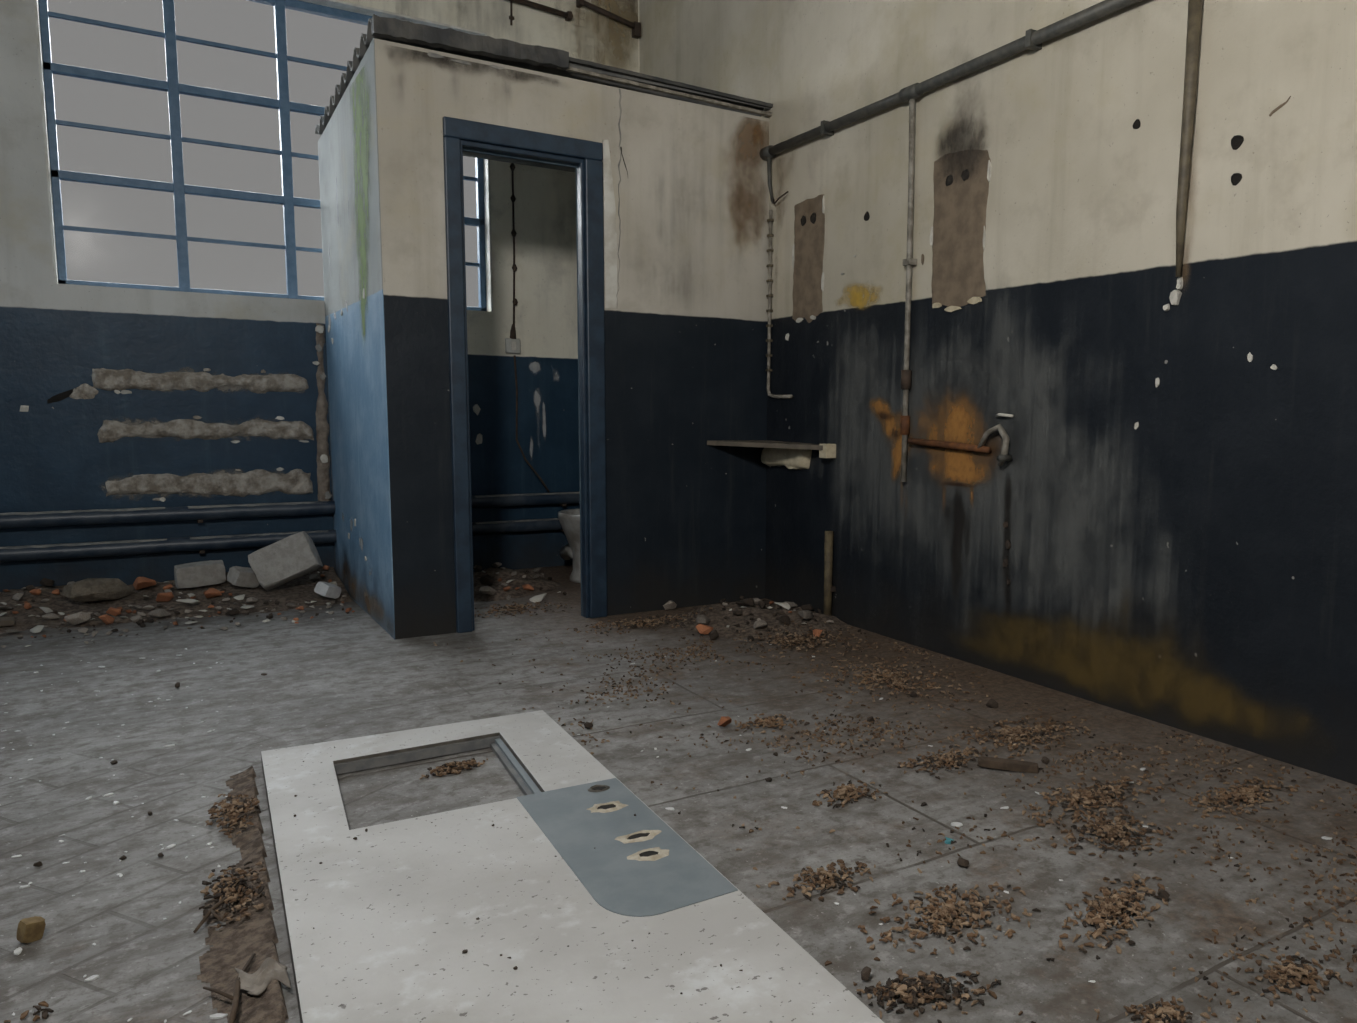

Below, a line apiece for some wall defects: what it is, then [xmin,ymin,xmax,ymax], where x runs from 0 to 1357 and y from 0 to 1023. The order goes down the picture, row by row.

water stain [585,0,638,68]
water stain [732,118,769,232]
rust [872,399,909,479]
rust [919,401,987,501]
water stain [974,480,1267,733]